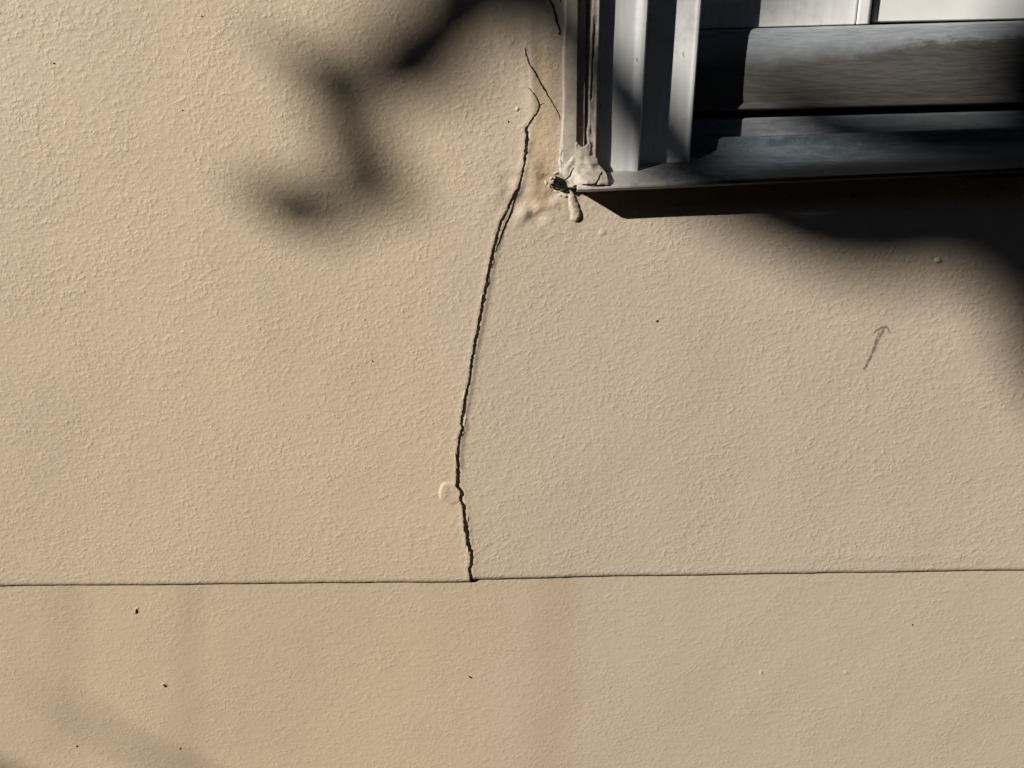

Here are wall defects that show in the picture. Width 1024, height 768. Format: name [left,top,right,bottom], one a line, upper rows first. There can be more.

crack [454,48,560,580]